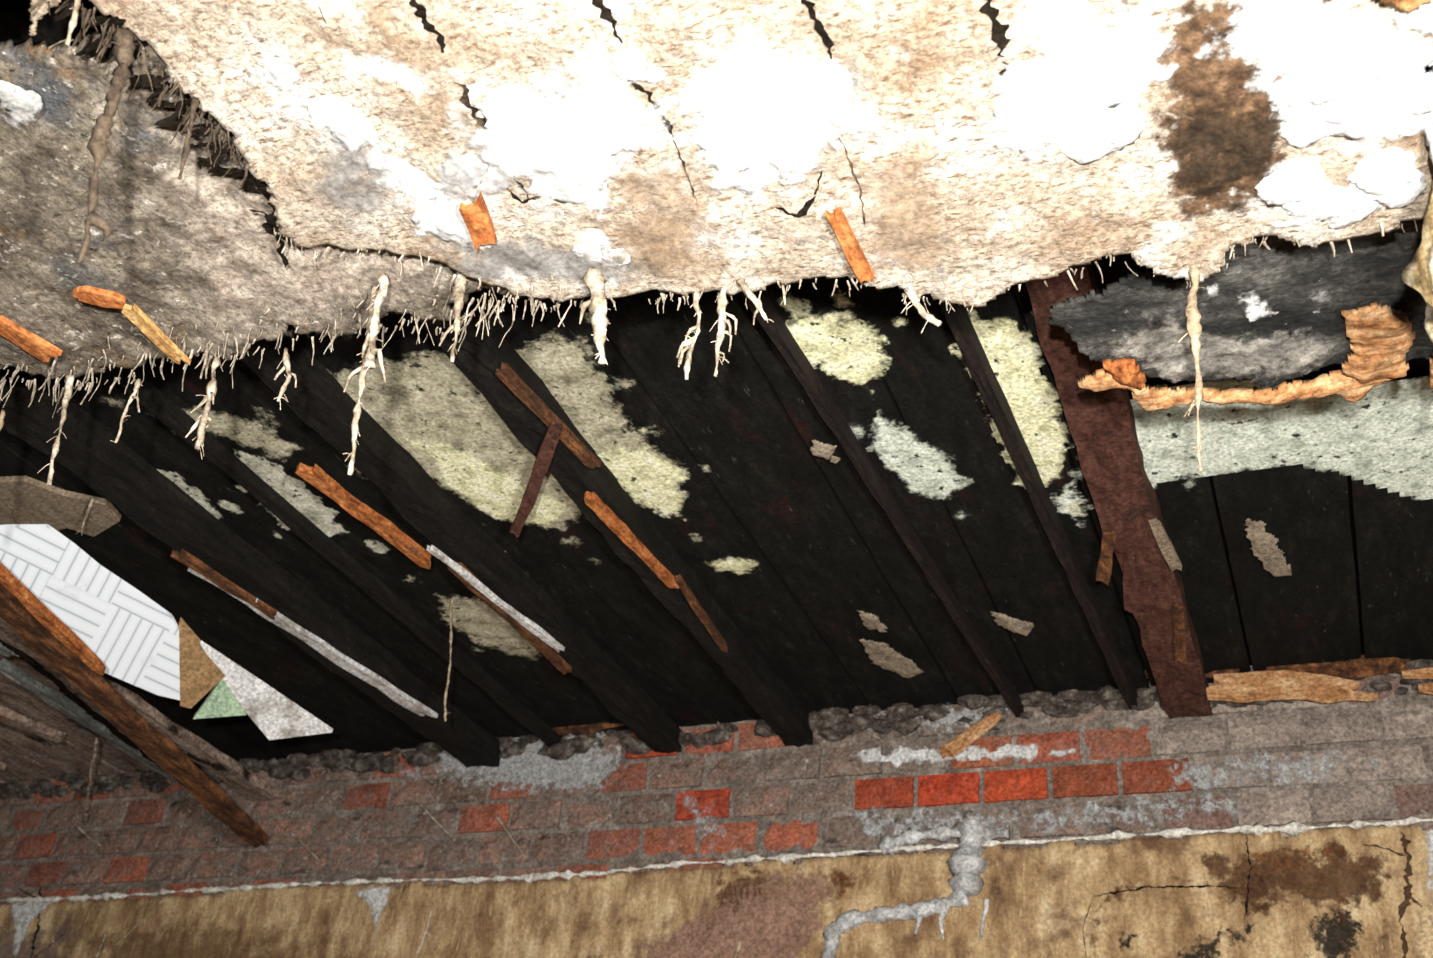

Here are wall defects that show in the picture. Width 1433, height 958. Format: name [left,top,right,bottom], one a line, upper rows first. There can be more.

crack [409,0,493,136]
crack [592,0,623,44]
crack [801,0,834,60]
crack [979,0,1015,106]
leakage [781,294,905,384]
peeling [810,440,841,463]
peeling [710,557,757,574]
peeling [1245,518,1292,577]
peeling [857,610,925,678]
leakage [858,707,1075,768]
leakage [855,749,1342,838]
leakage [1177,842,1390,958]